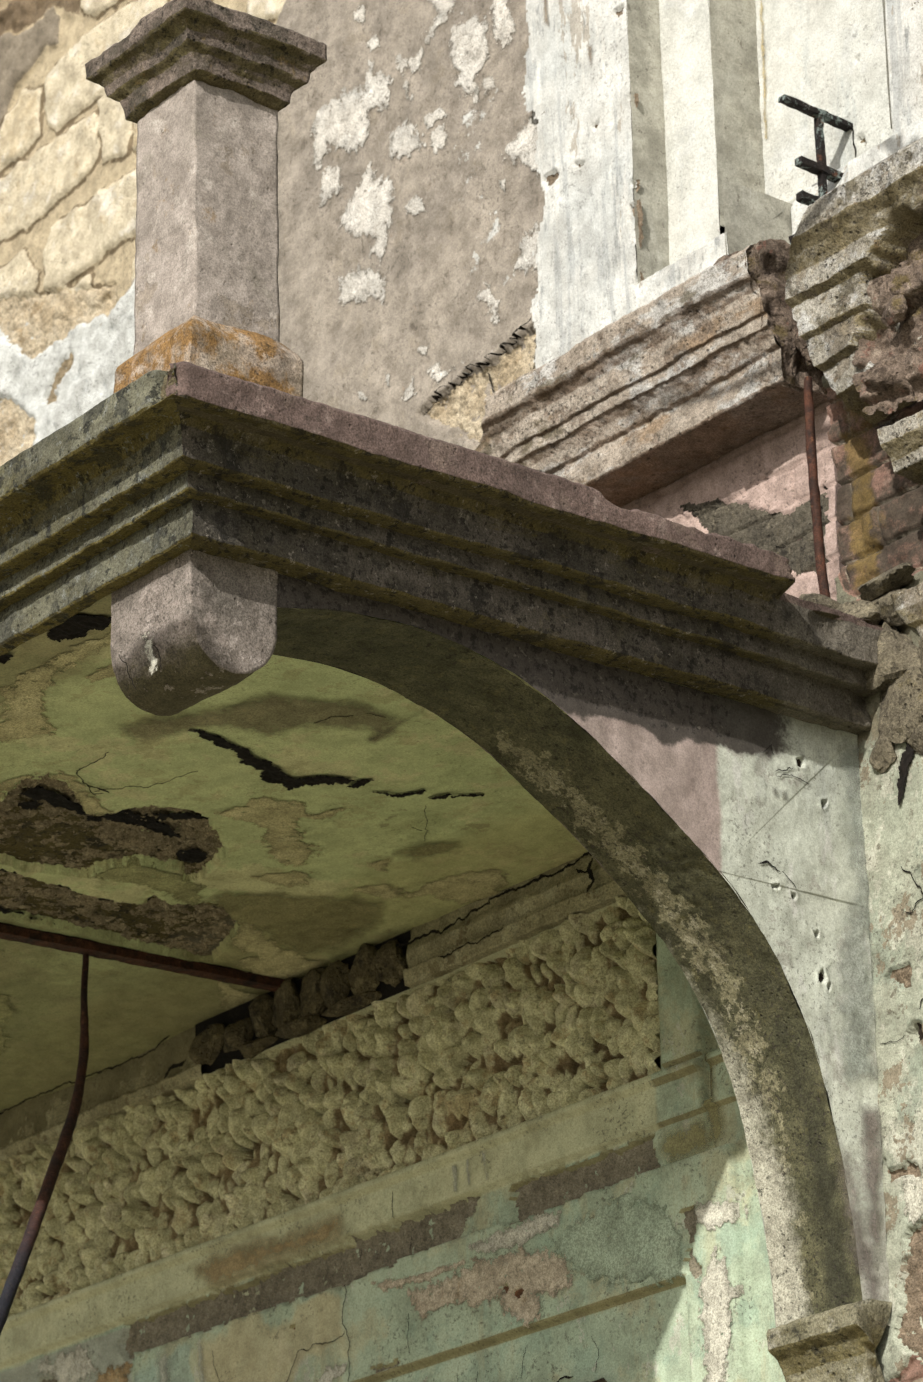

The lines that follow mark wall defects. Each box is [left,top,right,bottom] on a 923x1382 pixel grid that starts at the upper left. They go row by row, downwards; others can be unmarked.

peeling [310,0,517,306]
peeling [498,112,559,192]
spalling [0,398,36,466]
spalling [0,284,117,405]
spalling [384,331,537,442]
leakage [680,480,830,576]
peeling [0,615,115,743]
spalling [799,563,923,774]
crack [76,729,484,841]
spalling [0,770,408,1066]
spalling [29,1139,749,1382]
spalling [887,1162,923,1360]